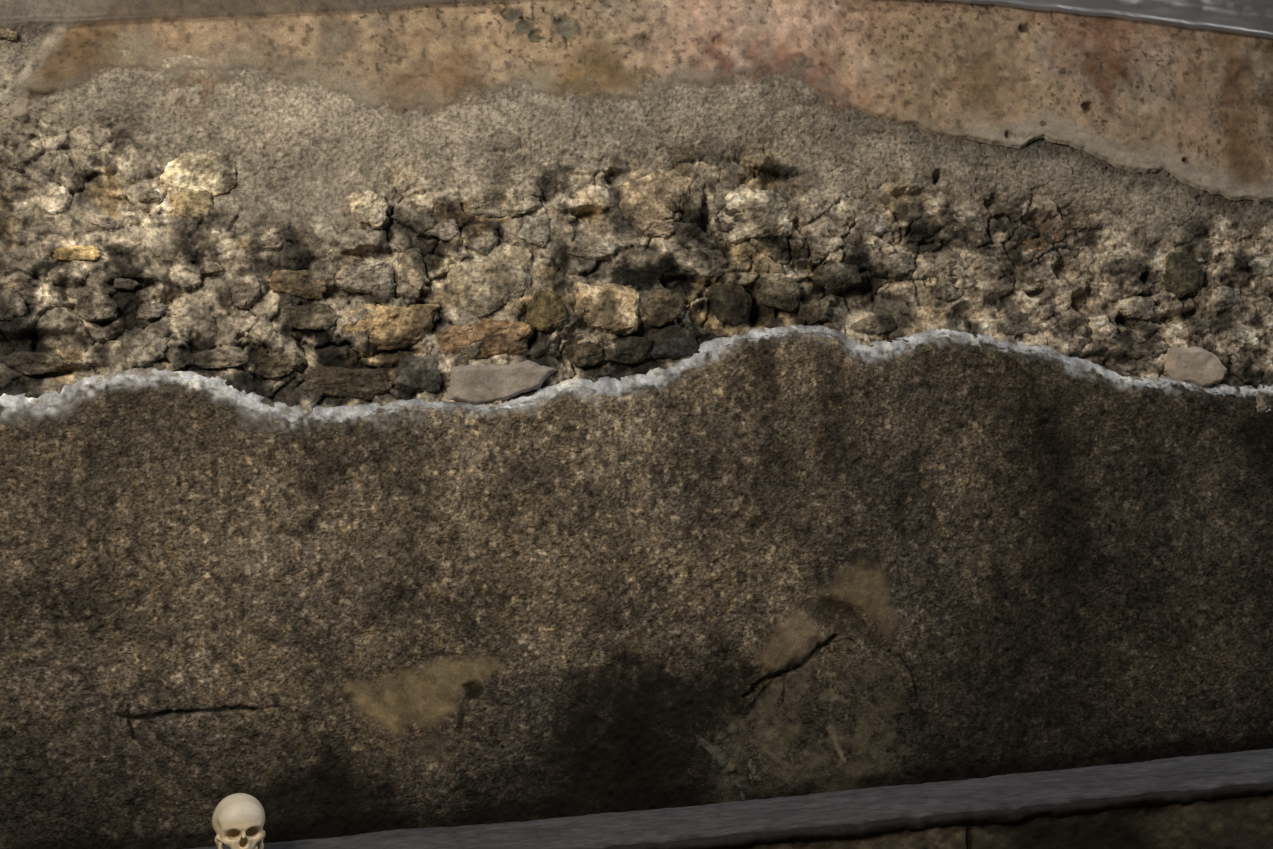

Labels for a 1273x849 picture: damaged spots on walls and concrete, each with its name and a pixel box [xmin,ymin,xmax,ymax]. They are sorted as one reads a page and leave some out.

spalling [0,0,1273,422]
crack [117,704,280,739]
spalling [345,659,497,727]
crack [743,635,854,708]